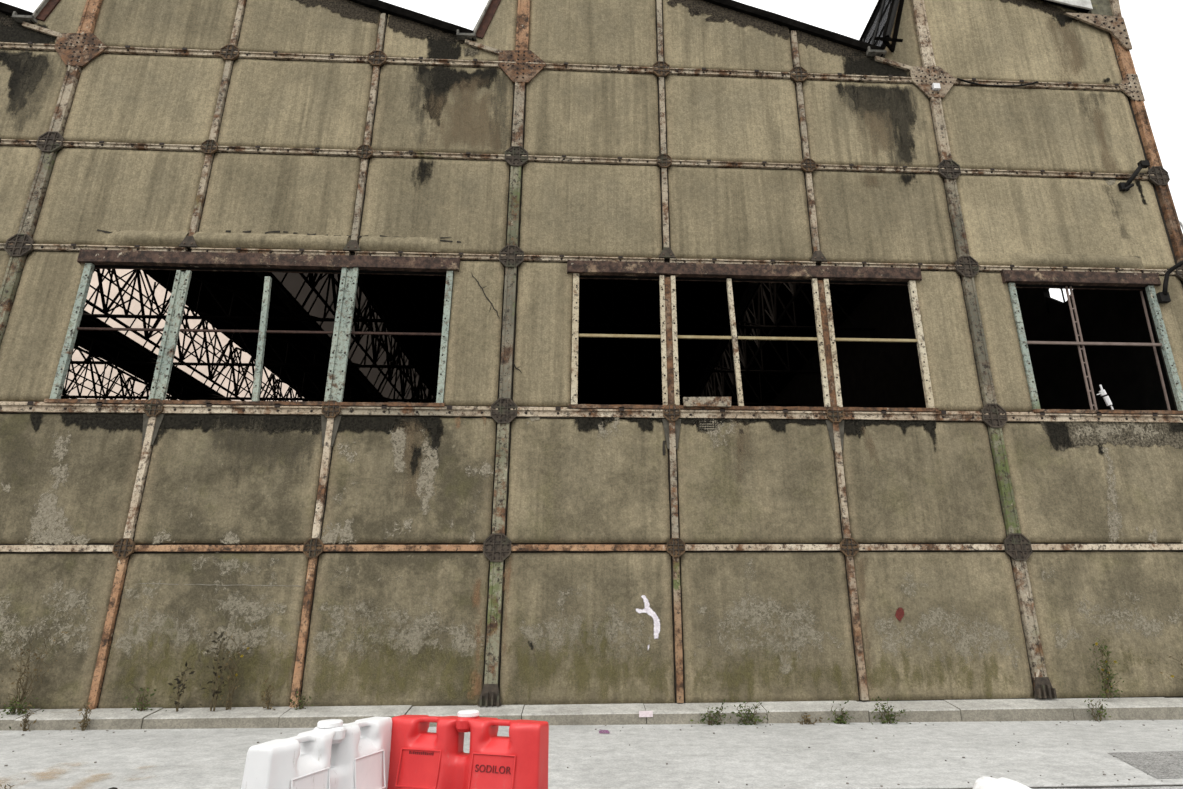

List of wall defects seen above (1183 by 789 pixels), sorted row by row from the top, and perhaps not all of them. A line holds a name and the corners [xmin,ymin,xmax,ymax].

water stain [0,12,56,127]
water stain [412,158,433,186]
water stain [411,33,507,149]
water stain [836,49,917,186]